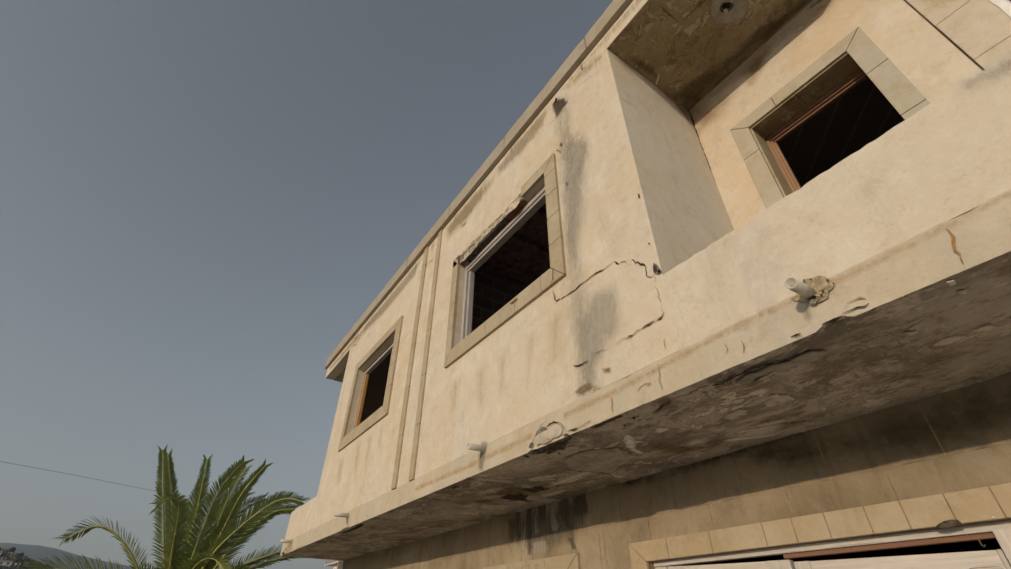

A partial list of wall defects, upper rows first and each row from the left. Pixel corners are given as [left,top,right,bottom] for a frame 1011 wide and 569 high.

water stain [553,99,567,116]
water stain [577,296,612,394]
crack [551,259,672,412]
spalling [790,275,834,305]
spalling [822,297,869,328]
flaking render [673,349,827,399]
spalling [522,415,623,458]
water stain [474,485,588,569]